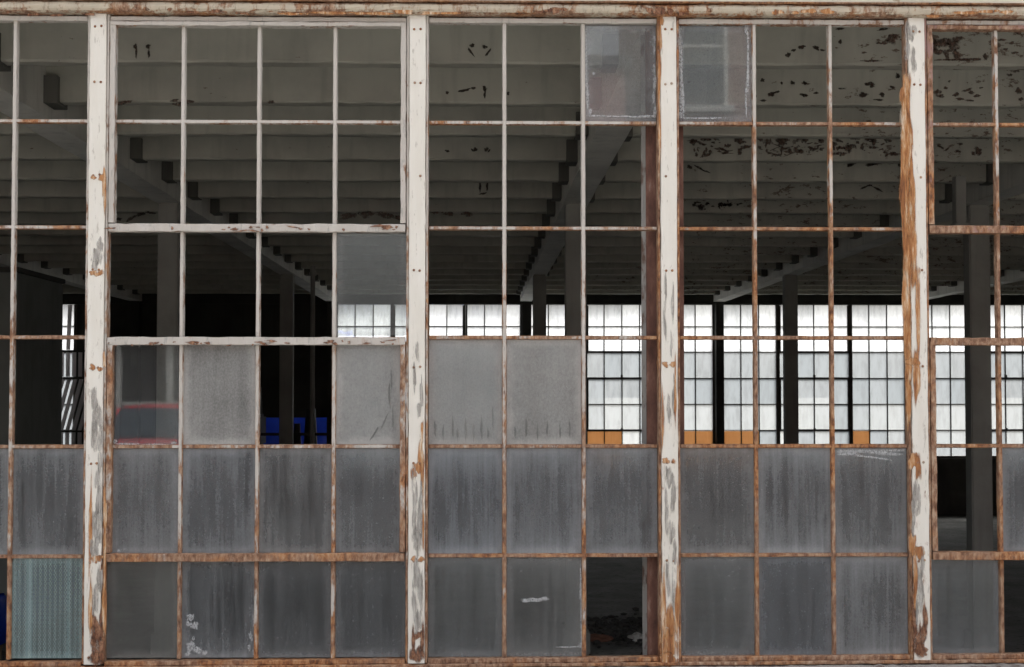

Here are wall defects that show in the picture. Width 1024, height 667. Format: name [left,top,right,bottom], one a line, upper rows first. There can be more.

peeling [745,25,818,117]
peeling [859,73,900,101]
peeling [860,22,917,72]
peeling [933,36,989,61]
peeling [687,138,901,173]
corrosion [899,75,921,431]
peeling [413,342,423,417]
peeling [90,387,176,615]
peeling [412,474,425,634]
peeling [665,466,676,613]
corrosion [908,452,921,479]
corrosion [909,533,928,657]